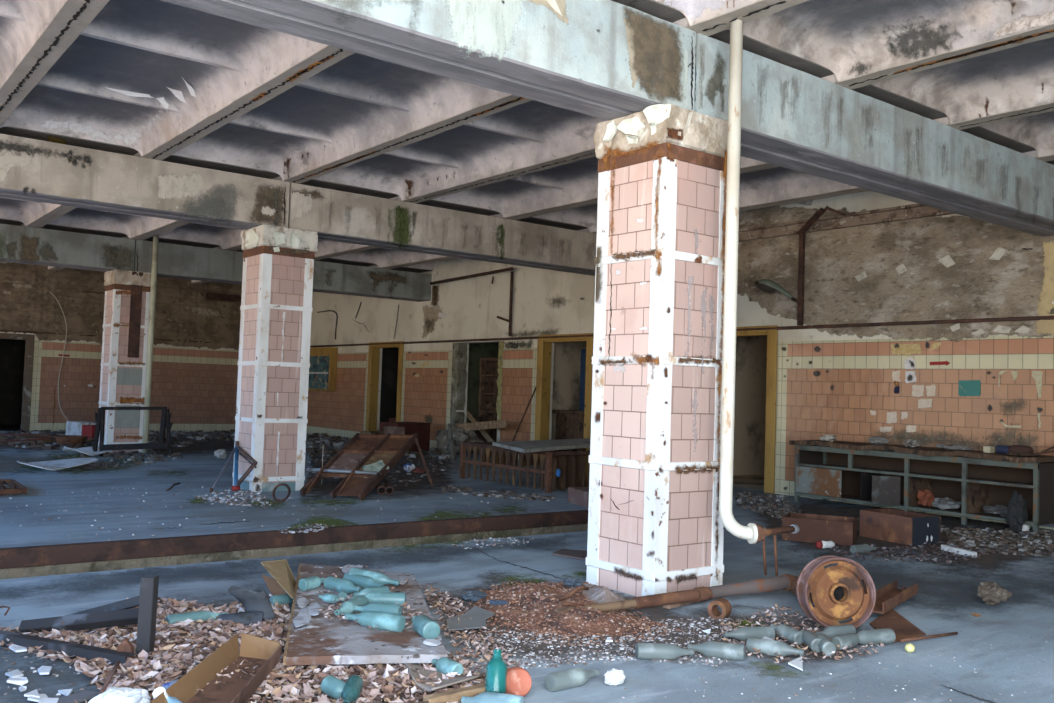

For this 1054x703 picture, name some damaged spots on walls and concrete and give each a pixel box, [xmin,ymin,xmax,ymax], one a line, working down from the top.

water stain [624,0,732,110]
water stain [889,21,956,58]
water stain [0,141,92,168]
peeling [603,104,671,144]
water stain [250,185,285,225]
rust [602,128,683,276]
flaking render [0,262,105,345]
flaking render [153,277,242,350]
flaking render [737,206,1054,394]
rust [595,354,668,379]
rust [659,150,727,575]
crack [940,684,996,703]